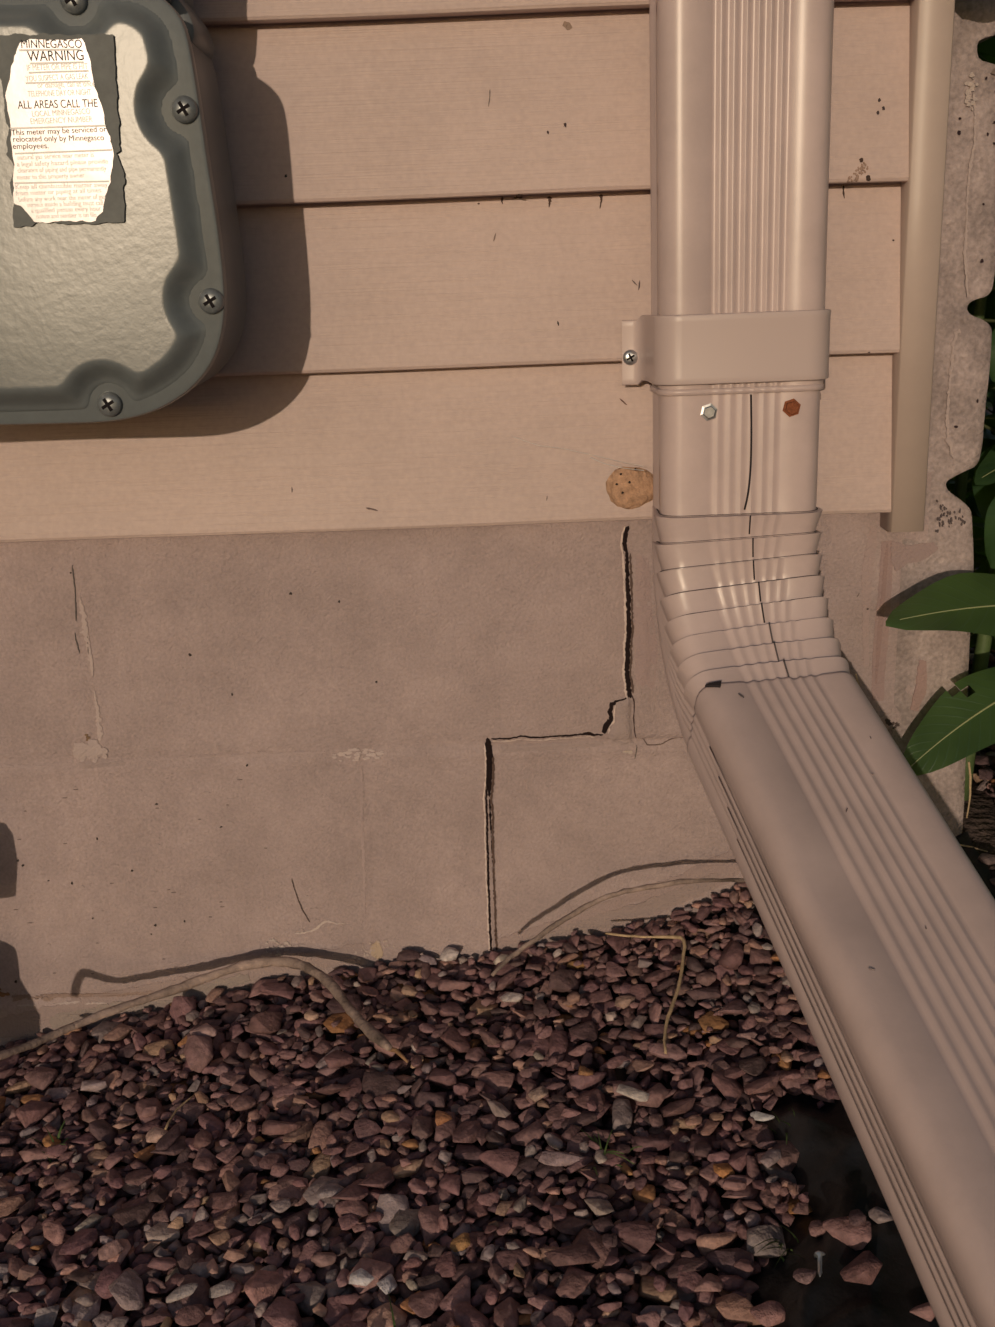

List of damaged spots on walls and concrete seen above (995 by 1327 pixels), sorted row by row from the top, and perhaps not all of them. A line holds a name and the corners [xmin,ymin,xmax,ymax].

crack [485,526,683,951]